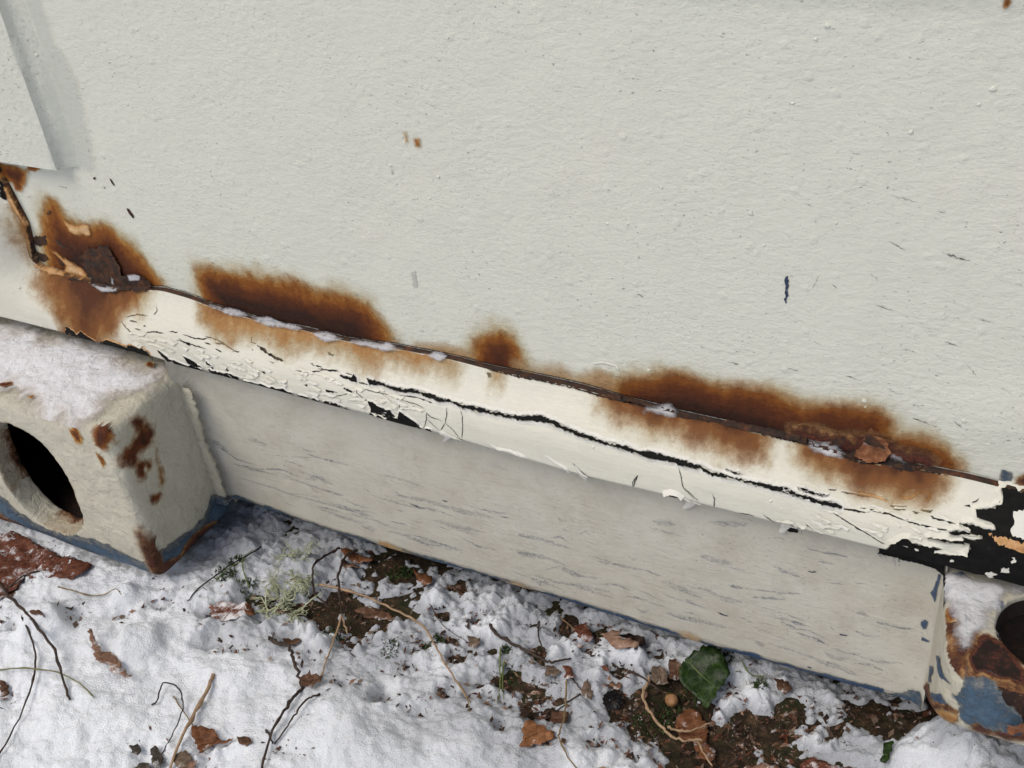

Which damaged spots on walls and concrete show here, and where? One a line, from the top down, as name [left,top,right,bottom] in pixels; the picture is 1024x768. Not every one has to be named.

rust [0,163,163,343]
crack [122,308,256,353]
peeling [65,326,462,443]
rust [194,267,959,502]
rust [69,421,116,467]
rust [119,417,165,504]
crack [295,368,980,545]
peeling [776,480,1024,608]
peeling [928,655,950,705]
rust [923,682,959,724]
rust [945,607,1024,742]